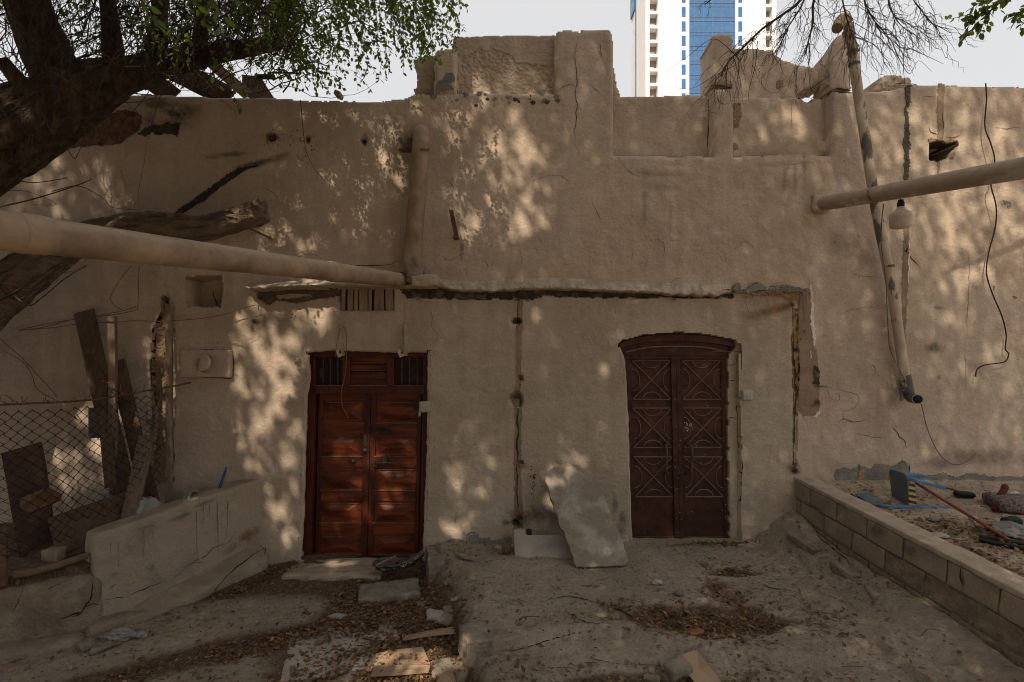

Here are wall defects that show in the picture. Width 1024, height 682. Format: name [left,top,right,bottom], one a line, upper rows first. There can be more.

crack [555,40,595,127]
spalling [71,109,181,148]
flaking render [256,288,342,305]
spalling [725,282,810,299]
spalling [146,296,175,483]
spalling [834,460,1024,481]
crack [58,531,266,622]